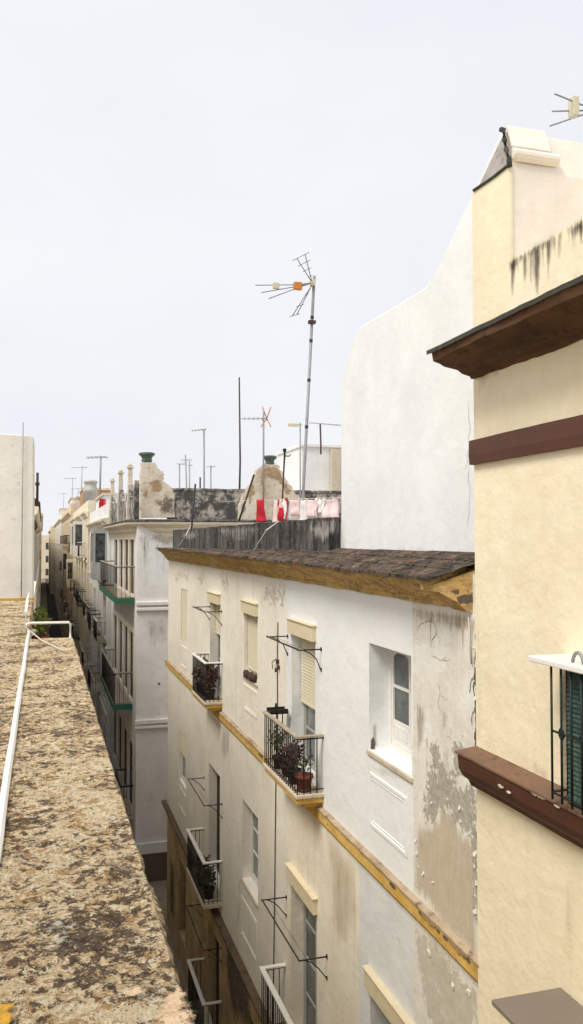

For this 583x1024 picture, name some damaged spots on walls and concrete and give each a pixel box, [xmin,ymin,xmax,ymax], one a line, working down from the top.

water stain [511,243,550,281]
flaking render [143,480,162,505]
crack [417,617,476,746]
peeling [414,732,478,963]